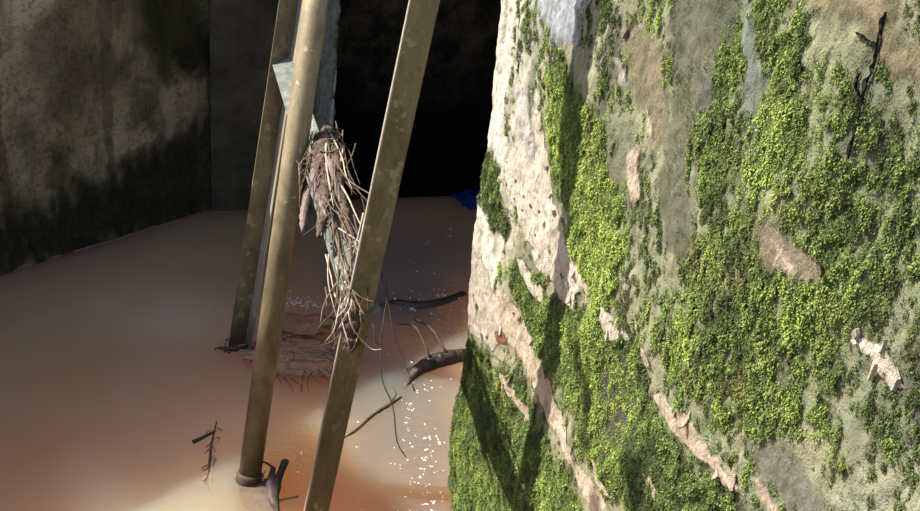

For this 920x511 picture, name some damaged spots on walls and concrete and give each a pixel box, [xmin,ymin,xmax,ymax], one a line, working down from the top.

peeling [812,0,920,83]
crack [846,12,887,159]
water stain [0,0,211,275]
spalling [505,110,589,310]
peeling [753,219,827,293]
peeling [468,244,609,511]
peeling [599,306,629,341]
spalling [851,328,904,391]
peeling [642,473,656,501]
peeling [653,393,739,492]